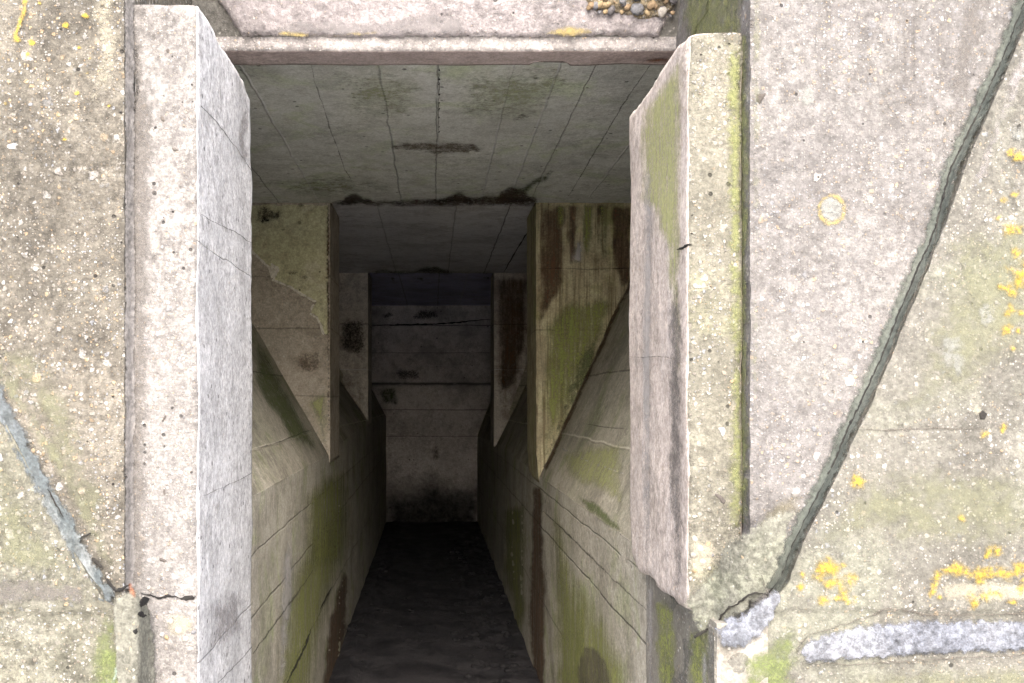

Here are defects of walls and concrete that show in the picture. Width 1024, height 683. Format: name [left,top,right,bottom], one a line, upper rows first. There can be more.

damp [393,143,477,154]
crack [435,66,443,136]
damp [258,206,285,230]
peeling [251,204,329,335]
damp [298,188,631,397]
damp [643,200,651,433]
crack [694,3,1024,639]
crack [79,532,196,634]